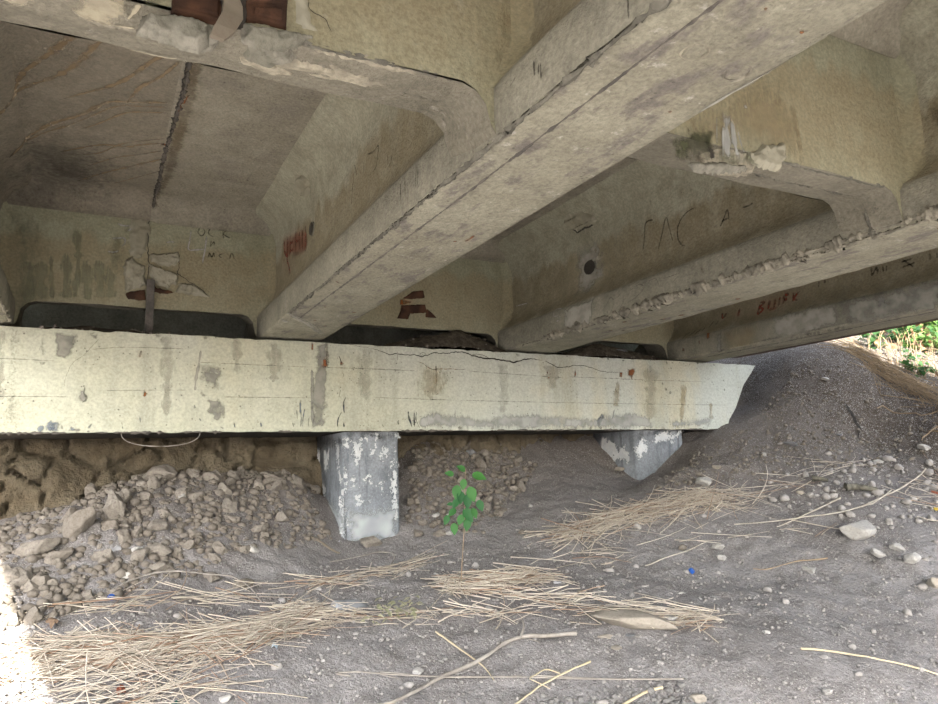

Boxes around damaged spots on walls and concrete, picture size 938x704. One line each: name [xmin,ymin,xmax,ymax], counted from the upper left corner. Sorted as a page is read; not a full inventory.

spalling [136,12,219,55]
corrosion [170,0,223,25]
corrosion [237,0,288,30]
spalling [241,23,313,68]
crack [152,61,199,208]
spalling [687,143,786,178]
water stain [56,333,75,357]
water stain [282,287,327,427]
crack [348,343,616,373]
water stain [194,351,224,420]